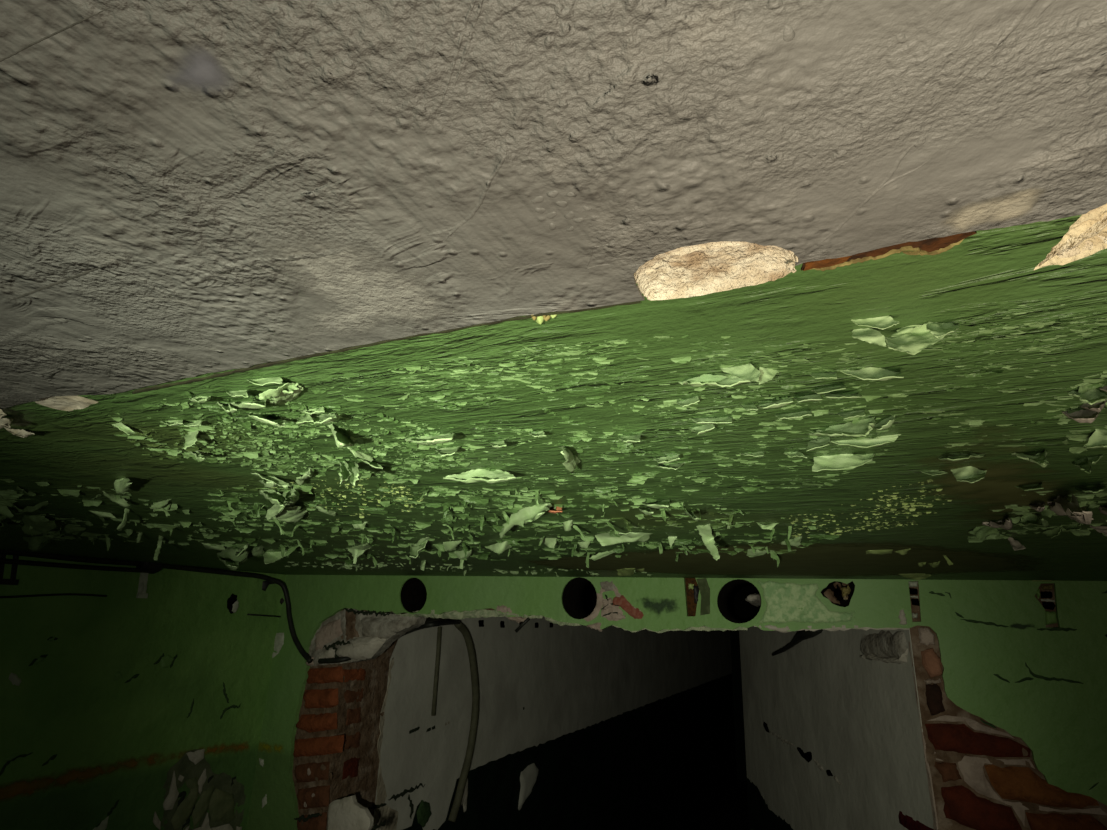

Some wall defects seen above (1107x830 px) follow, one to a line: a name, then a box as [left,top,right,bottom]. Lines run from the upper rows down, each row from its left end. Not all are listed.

flaking render [634,241,798,301]
corrosion [801,231,977,271]
flaking render [1033,204,1107,271]
peeling [0,299,1107,830]